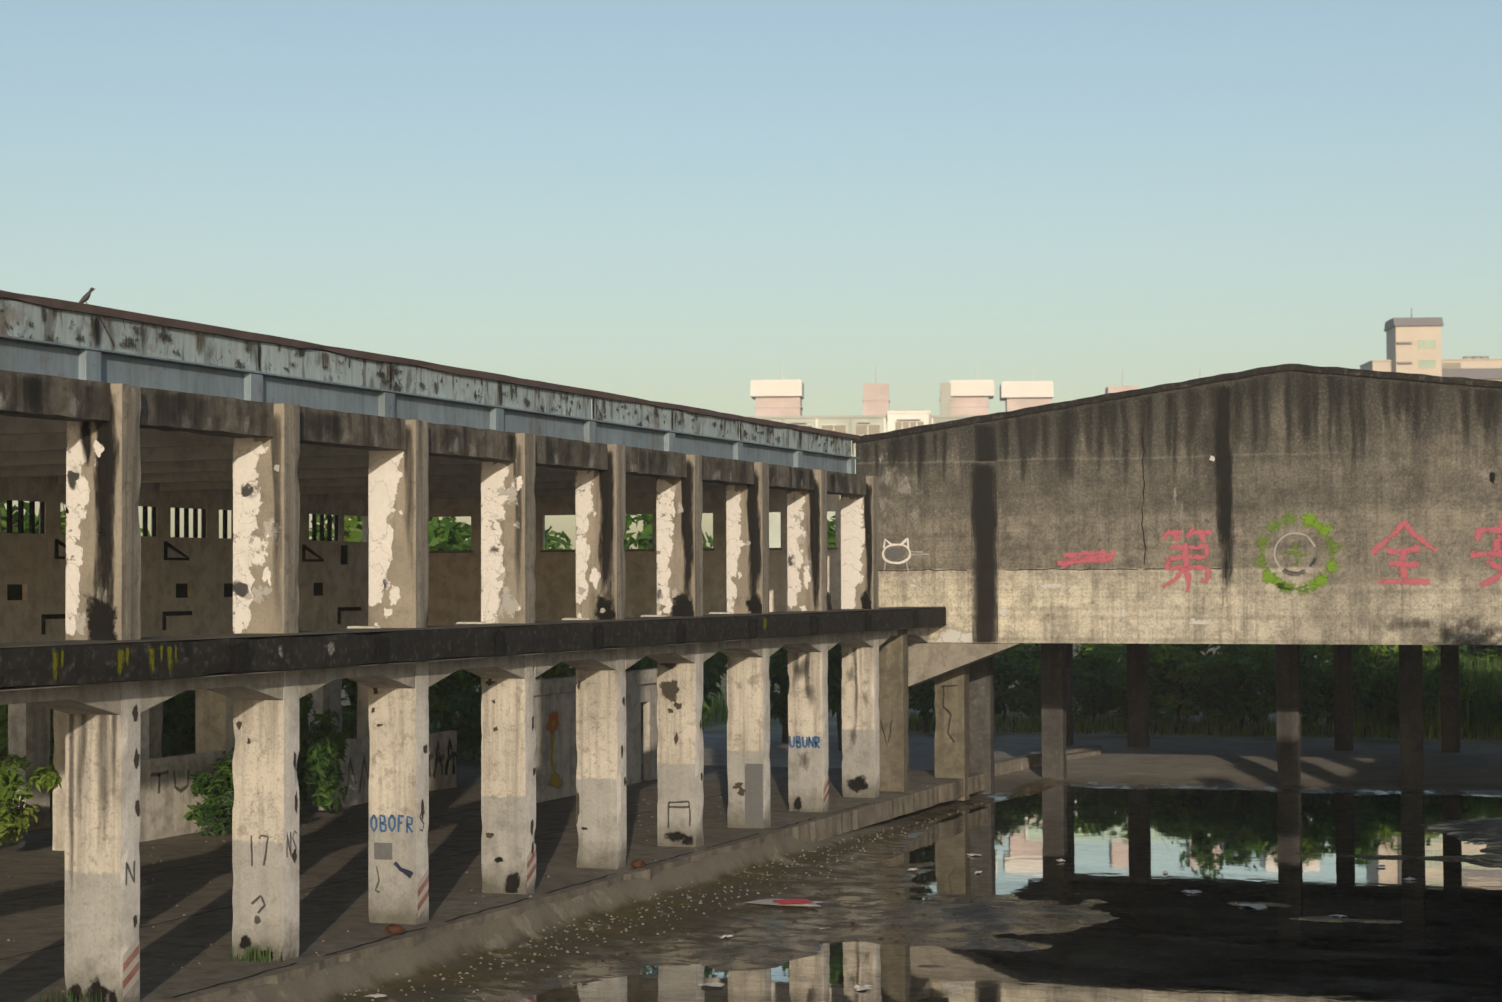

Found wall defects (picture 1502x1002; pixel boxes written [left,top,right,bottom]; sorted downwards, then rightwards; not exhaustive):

peeling [65,421,107,636]
peeling [99,317,141,348]
peeling [233,438,282,634]
peeling [368,450,404,626]
peeling [376,366,480,398]
peeling [481,461,523,623]
peeling [576,470,606,618]
peeling [503,389,724,437]
peeling [656,479,684,615]
water stain [1215,387,1234,586]